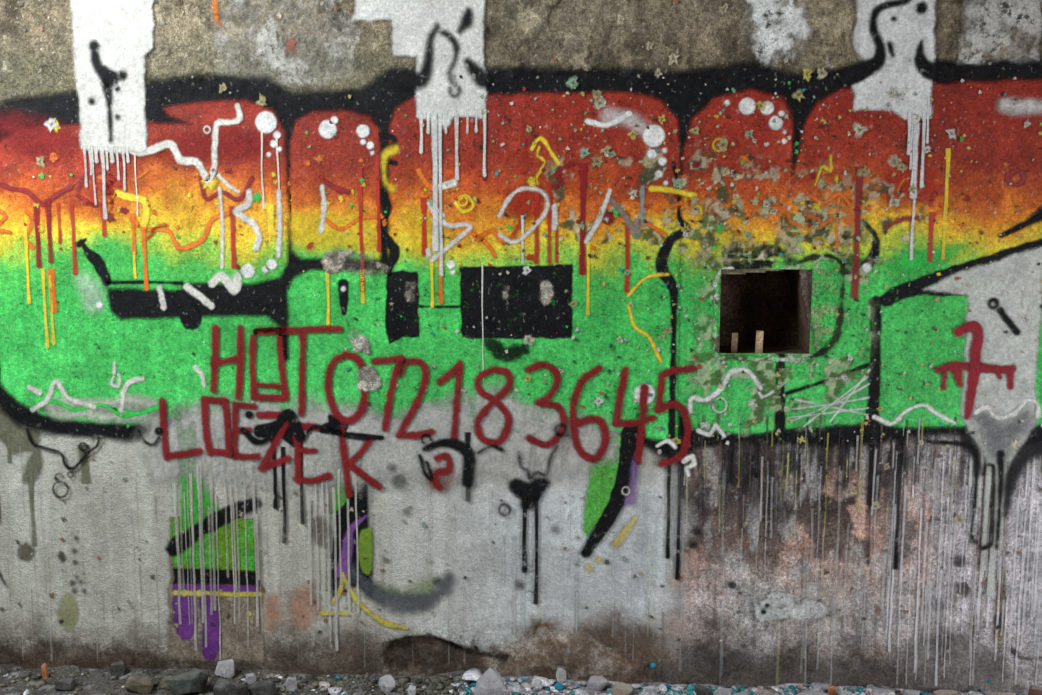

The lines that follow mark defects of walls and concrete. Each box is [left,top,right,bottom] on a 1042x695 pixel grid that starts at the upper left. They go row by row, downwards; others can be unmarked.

peeling [547,165,573,201]
peeling [617,154,666,189]
peeling [560,210,594,241]
peeling [638,193,679,244]
spalling [679,155,904,429]
leakage [957,582,970,596]
leakage [0,642,163,670]
leakage [234,637,378,675]
leakage [572,621,1019,691]